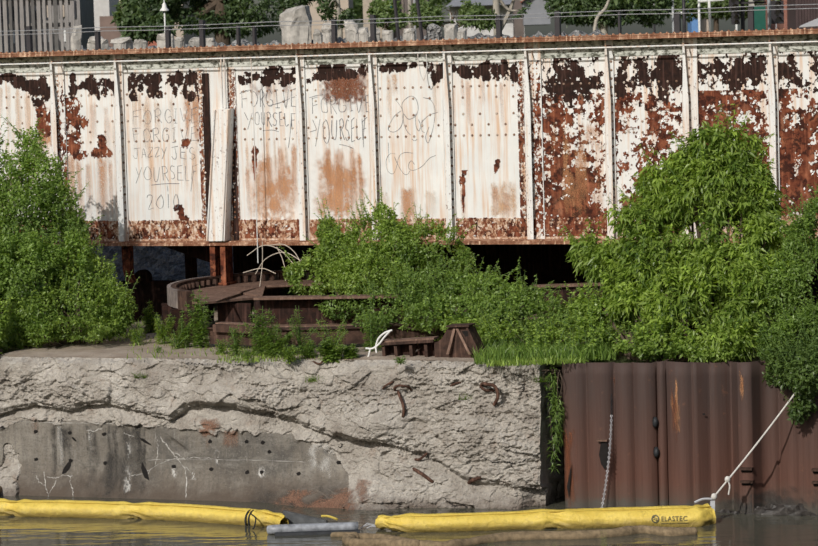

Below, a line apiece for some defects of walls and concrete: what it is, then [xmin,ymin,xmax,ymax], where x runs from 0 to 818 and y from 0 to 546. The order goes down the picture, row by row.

peeling [127,69,198,102]
peeling [379,59,518,86]
peeling [541,55,683,108]
peeling [697,52,768,104]
rust [34,80,113,200]
rust [401,60,607,239]
rust [614,91,683,233]
rust [698,89,770,170]
rust [778,88,818,216]
crack [9,448,74,495]
crack [131,435,221,496]
spalling [0,352,549,510]